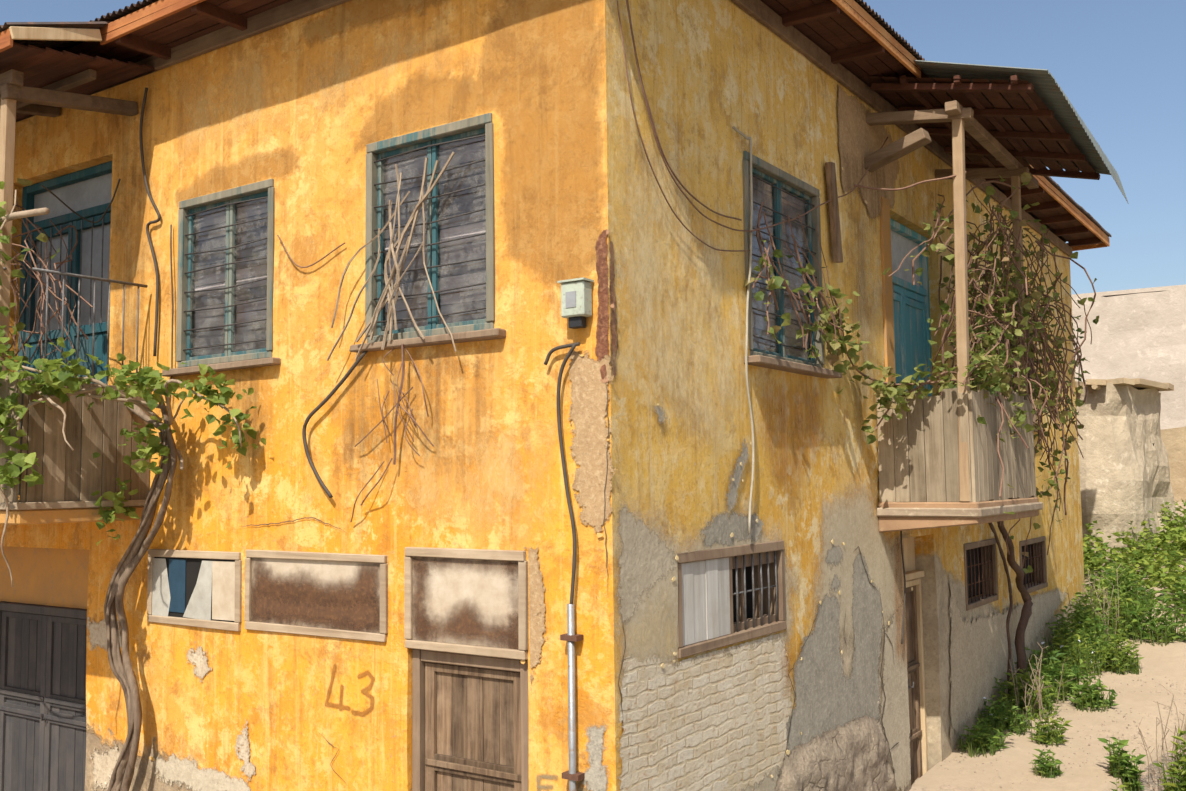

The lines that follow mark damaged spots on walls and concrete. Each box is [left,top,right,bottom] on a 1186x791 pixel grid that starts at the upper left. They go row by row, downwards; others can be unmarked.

spalling [568,229,913,791]
peeling [186,644,212,683]
peeling [521,547,548,697]
peeling [949,575,1068,739]
peeling [90,744,121,791]
peeling [149,719,256,791]